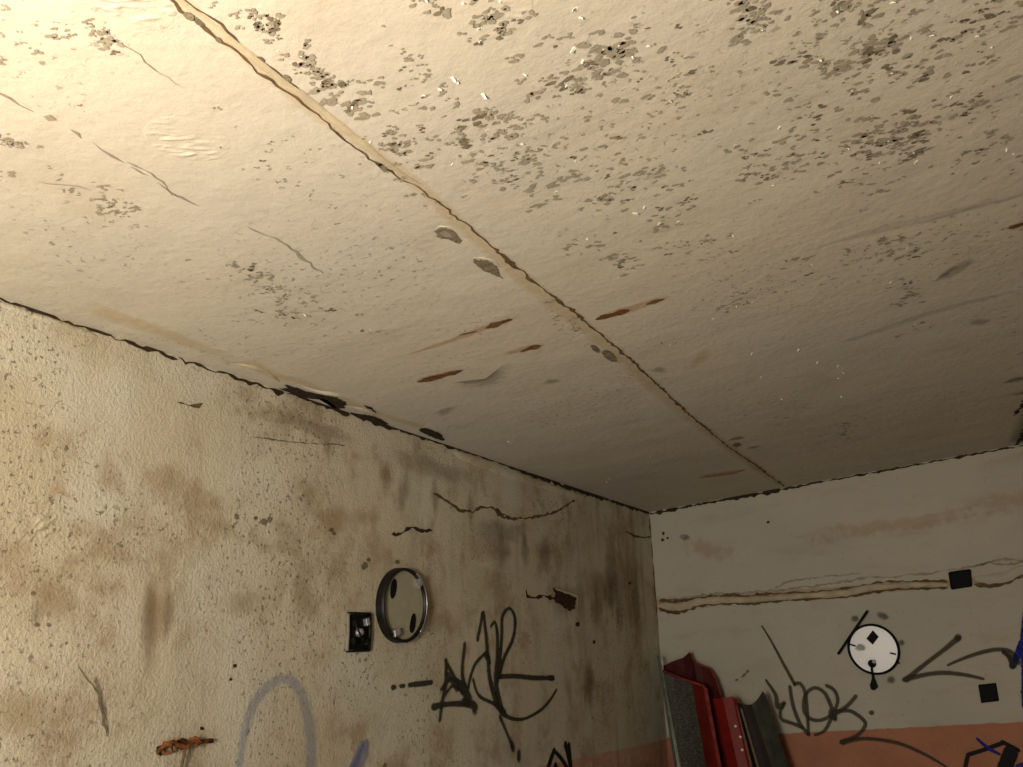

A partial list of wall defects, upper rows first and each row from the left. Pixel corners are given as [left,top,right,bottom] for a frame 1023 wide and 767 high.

crack [107,38,179,86]
crack [0,93,195,205]
crack [0,298,284,396]
corrosion [460,319,512,335]
crack [170,0,1023,622]
corrosion [595,309,629,320]
corrosion [418,370,462,382]
flaking render [227,363,489,461]
spalling [553,587,578,611]